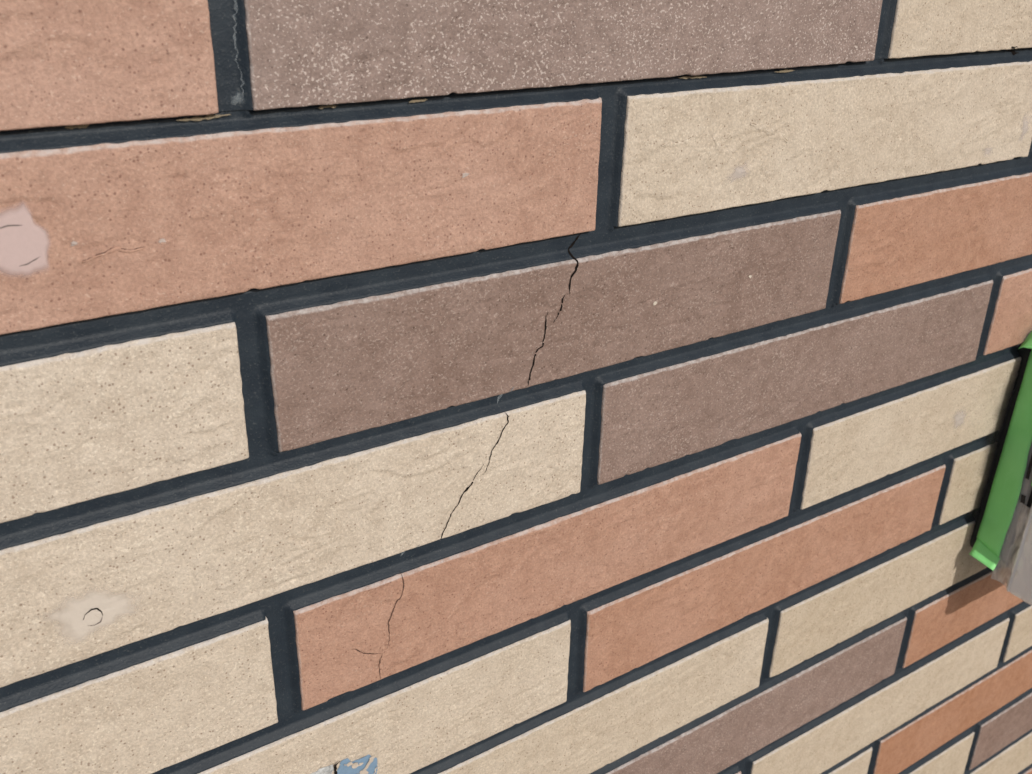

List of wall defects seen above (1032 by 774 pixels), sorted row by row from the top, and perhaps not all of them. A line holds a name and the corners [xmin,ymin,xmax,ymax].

crack [528,233,581,385]
crack [440,411,509,540]
crack [355,572,404,679]
spalling [311,755,378,774]